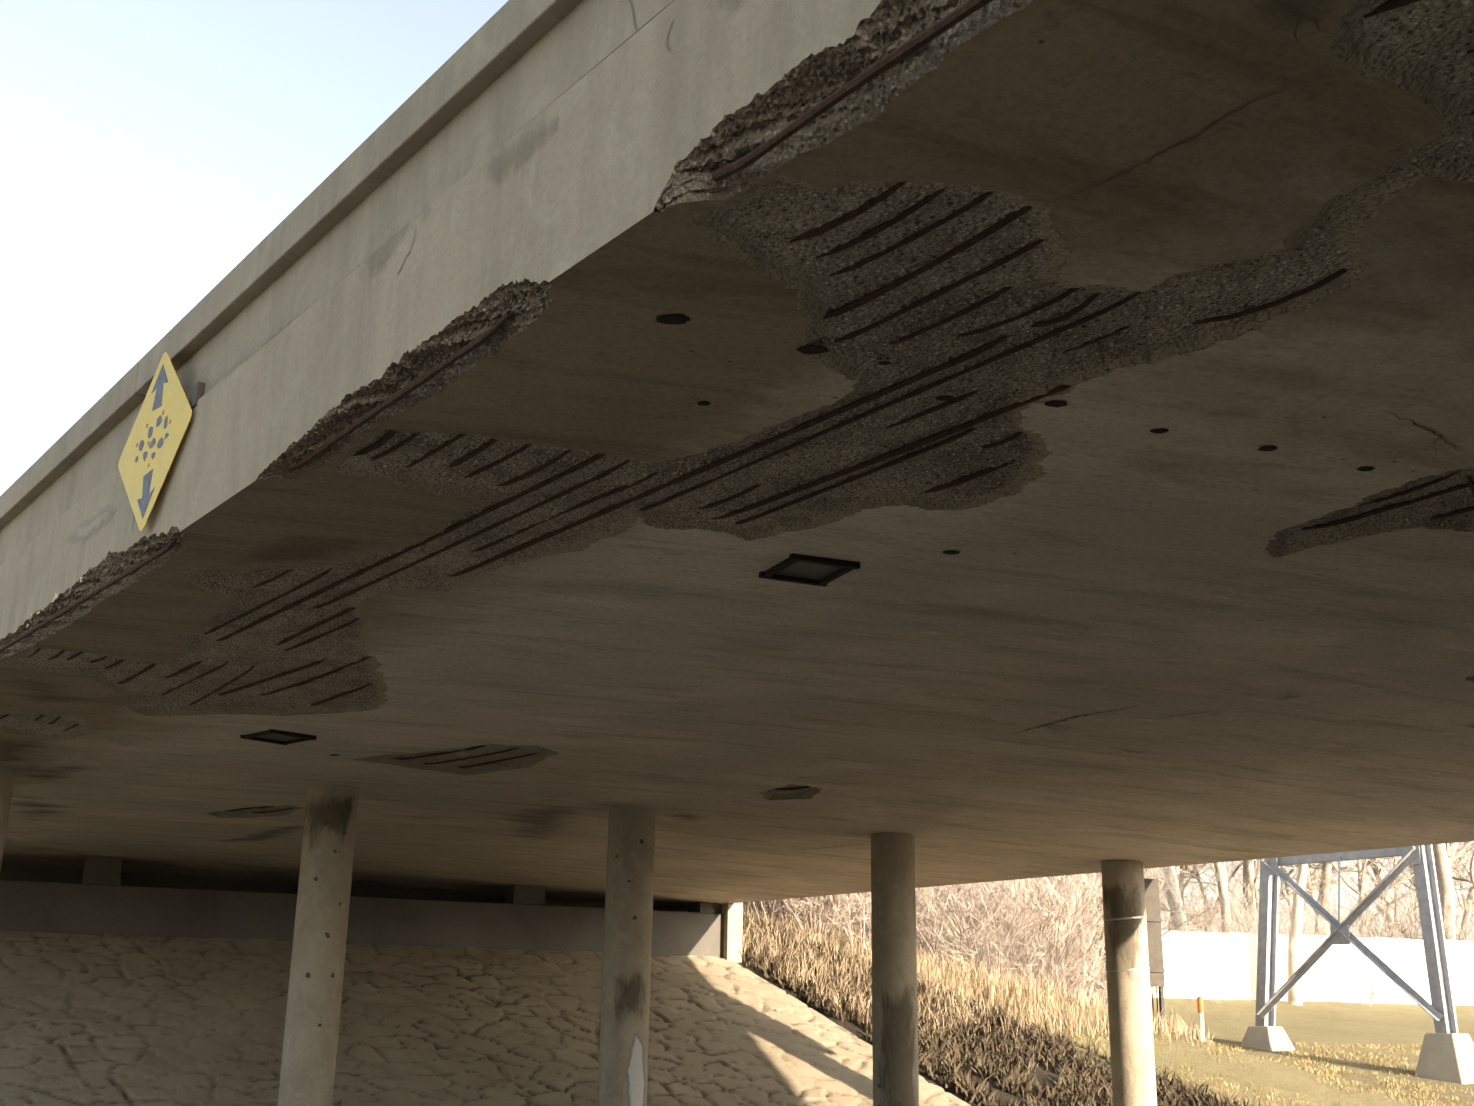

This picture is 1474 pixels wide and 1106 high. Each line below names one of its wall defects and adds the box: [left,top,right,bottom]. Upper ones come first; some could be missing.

crack [1048,76,1334,204]
spalling [0,0,1474,716]
spalling [330,744,559,776]